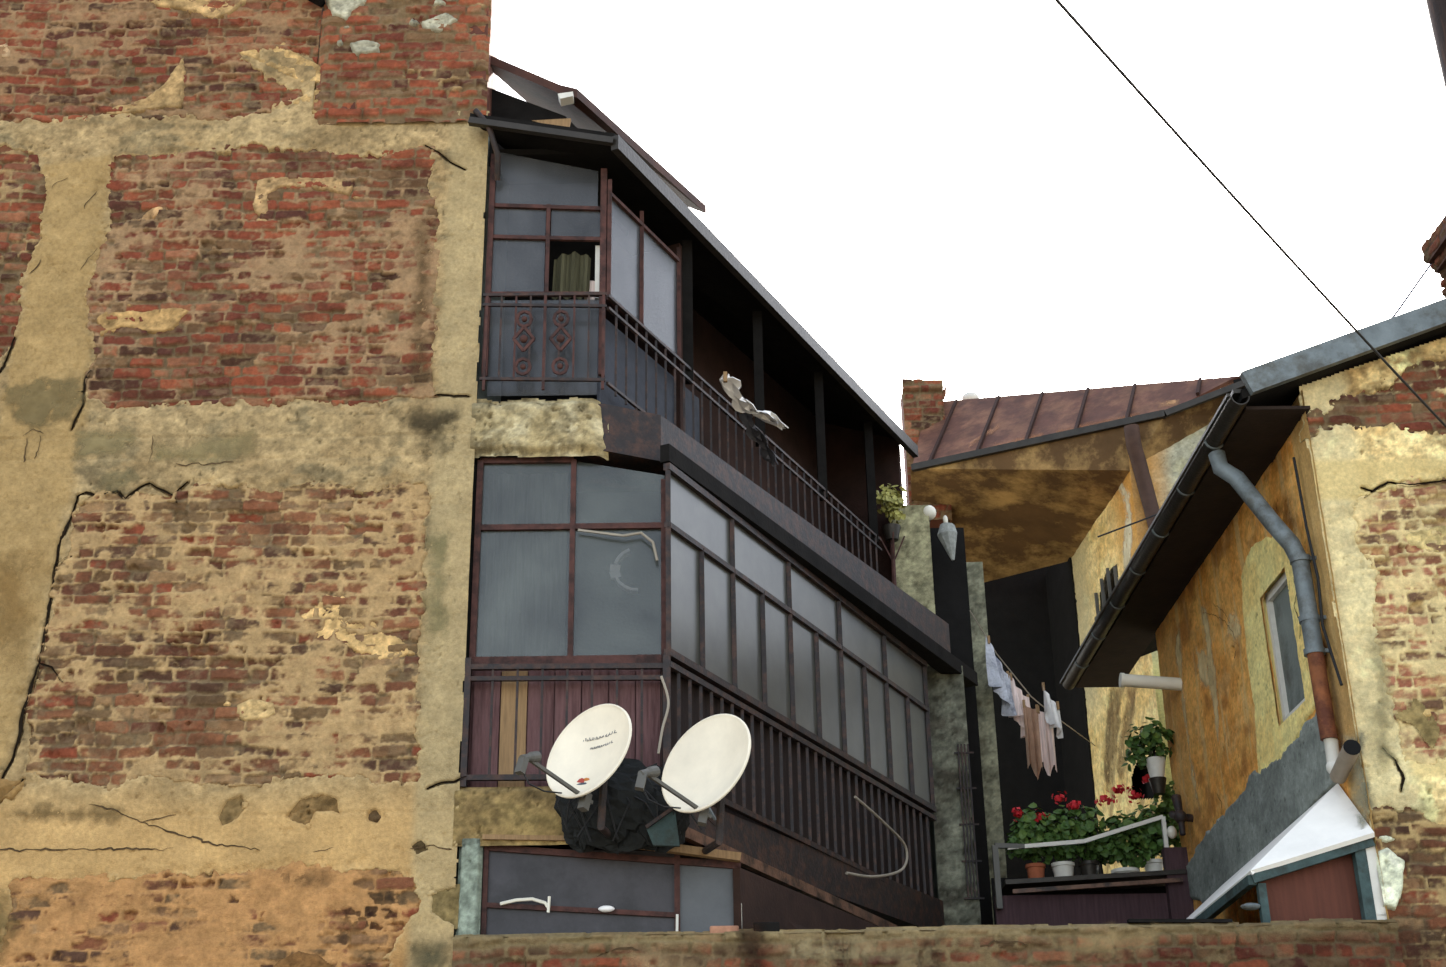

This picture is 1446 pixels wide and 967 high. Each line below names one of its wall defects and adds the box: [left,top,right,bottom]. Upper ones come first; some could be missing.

flaking render [0,0,380,123]
crack [0,337,16,373]
flaking render [0,145,47,357]
flaking render [85,144,440,409]
flaking render [1306,360,1446,438]
crack [1,436,232,782]
flaking render [23,480,431,829]
flaking render [1353,474,1446,765]
crack [0,804,260,852]
flaking render [0,860,460,967]